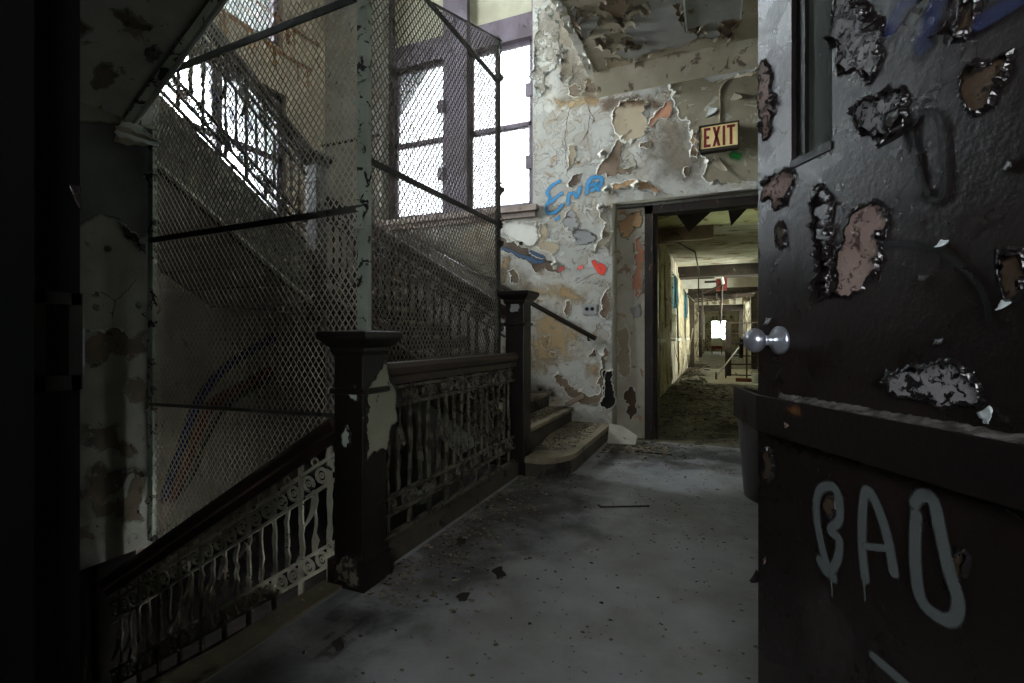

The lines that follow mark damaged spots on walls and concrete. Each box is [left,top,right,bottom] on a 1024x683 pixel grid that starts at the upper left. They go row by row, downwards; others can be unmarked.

peeling [529,0,742,98]
peeling [821,0,919,149]
peeling [956,48,1017,118]
peeling [499,58,796,300]
peeling [806,182,891,304]
peeling [993,244,1024,311]
peeling [340,361,399,461]
flaking render [553,288,638,420]
peeling [879,337,993,424]